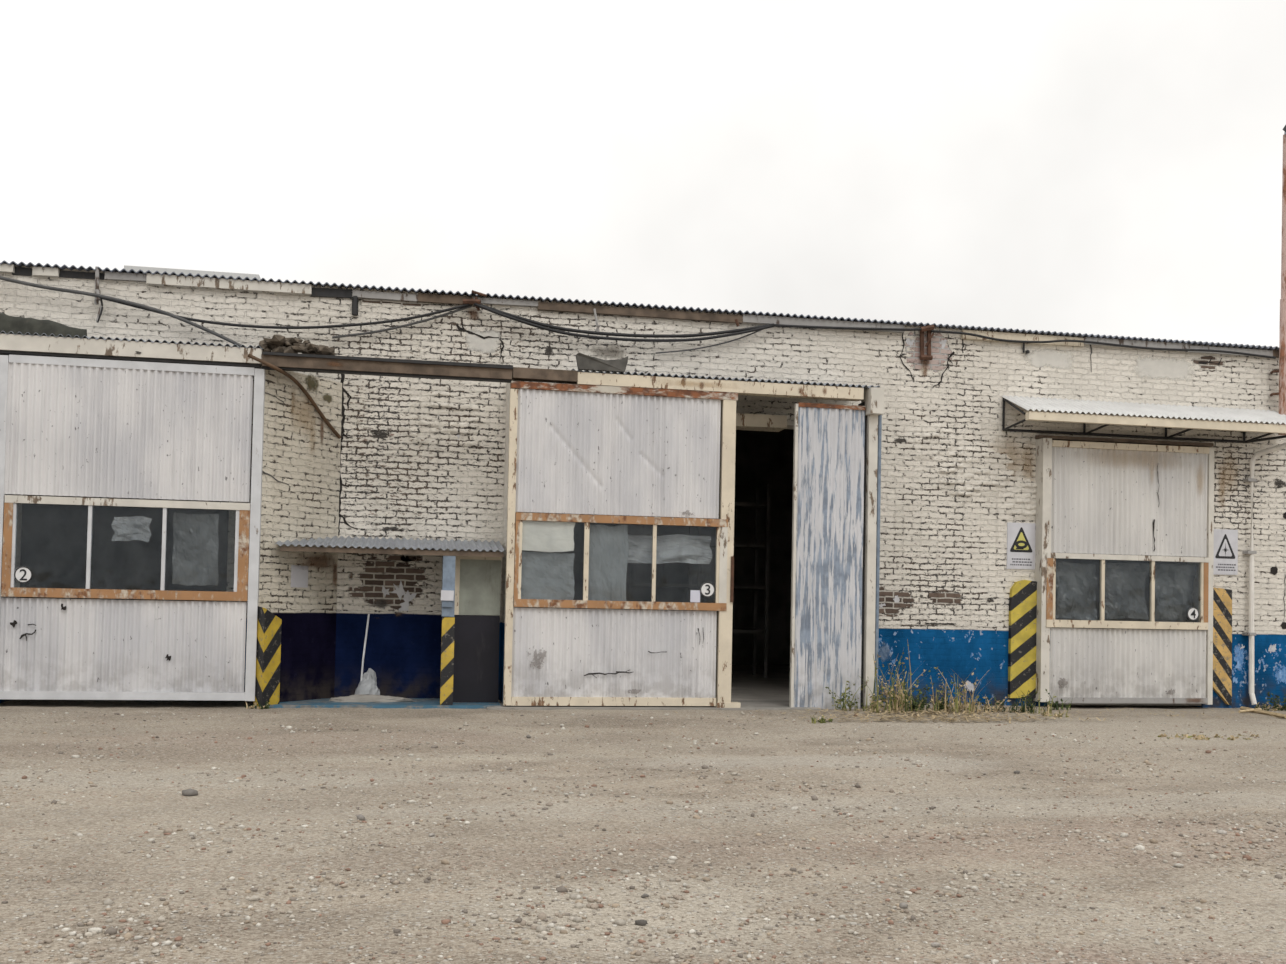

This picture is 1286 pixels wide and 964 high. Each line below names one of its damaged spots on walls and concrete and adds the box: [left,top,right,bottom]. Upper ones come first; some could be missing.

spalling [349,554,429,616]
spalling [879,587,962,617]
peeling [1233,644,1246,683]
peeling [1268,644,1286,684]